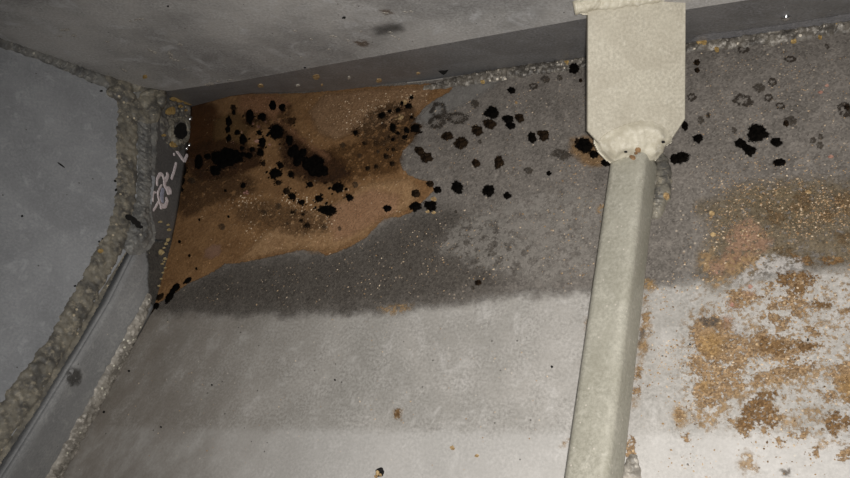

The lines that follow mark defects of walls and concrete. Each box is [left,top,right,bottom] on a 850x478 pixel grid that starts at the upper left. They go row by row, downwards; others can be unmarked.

leakage [151,59,610,316]
leakage [644,14,850,286]
corrosion [673,182,850,462]
corrosion [739,454,758,472]